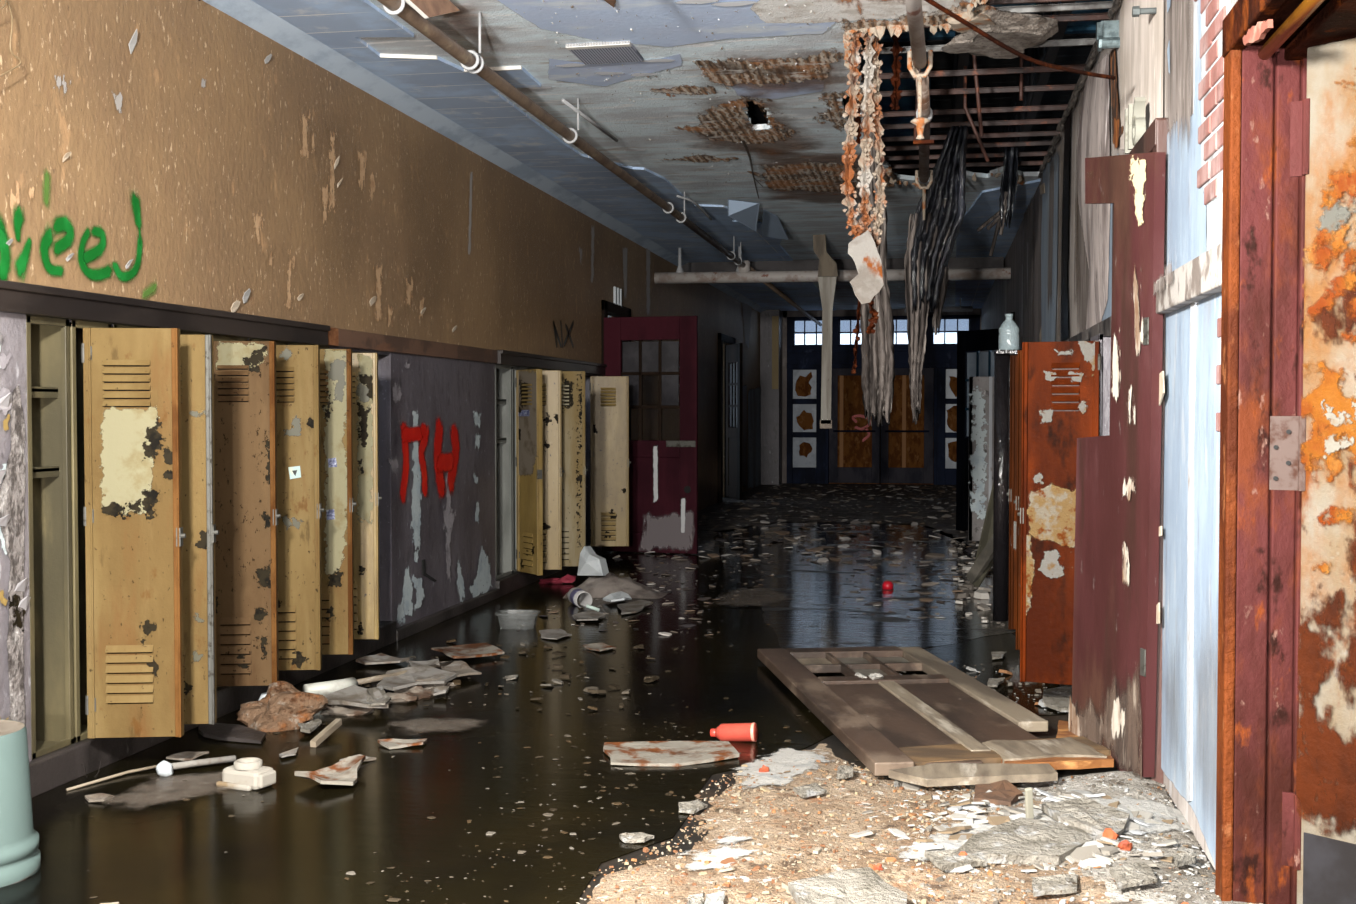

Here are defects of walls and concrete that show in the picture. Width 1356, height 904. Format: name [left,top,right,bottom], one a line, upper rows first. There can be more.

flaking render [967,0,988,16]
flaking render [1194,0,1227,205]
water stain [1074,152,1089,333]
peeling [1129,155,1146,226]
rust [1302,225,1356,344]
rust [1320,169,1356,209]
peeling [141,413,169,463]
rust [1301,361,1356,489]
flaking render [0,385,31,725]
peeling [101,489,165,520]
rust [1317,506,1356,579]
rust [1296,589,1356,836]